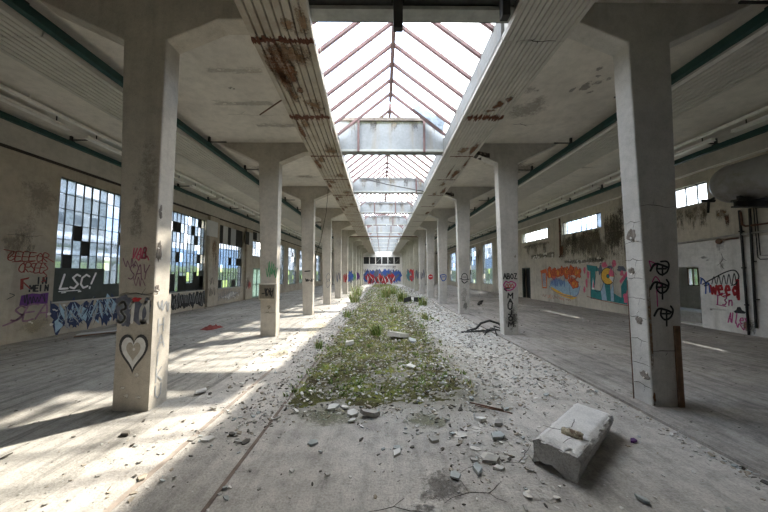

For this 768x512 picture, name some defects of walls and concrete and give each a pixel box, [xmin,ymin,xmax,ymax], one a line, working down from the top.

rust [251,8,332,137]
rust [465,97,513,122]
damp [563,208,625,262]